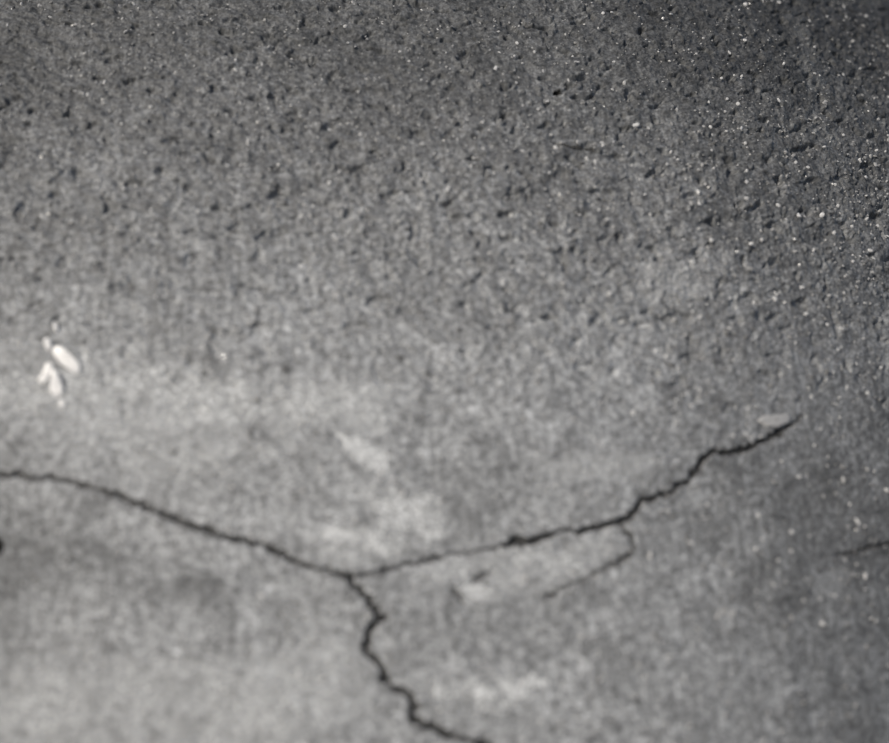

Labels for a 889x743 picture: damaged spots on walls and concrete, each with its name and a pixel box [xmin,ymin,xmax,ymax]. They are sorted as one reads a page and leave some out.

crack [0,415,801,743]